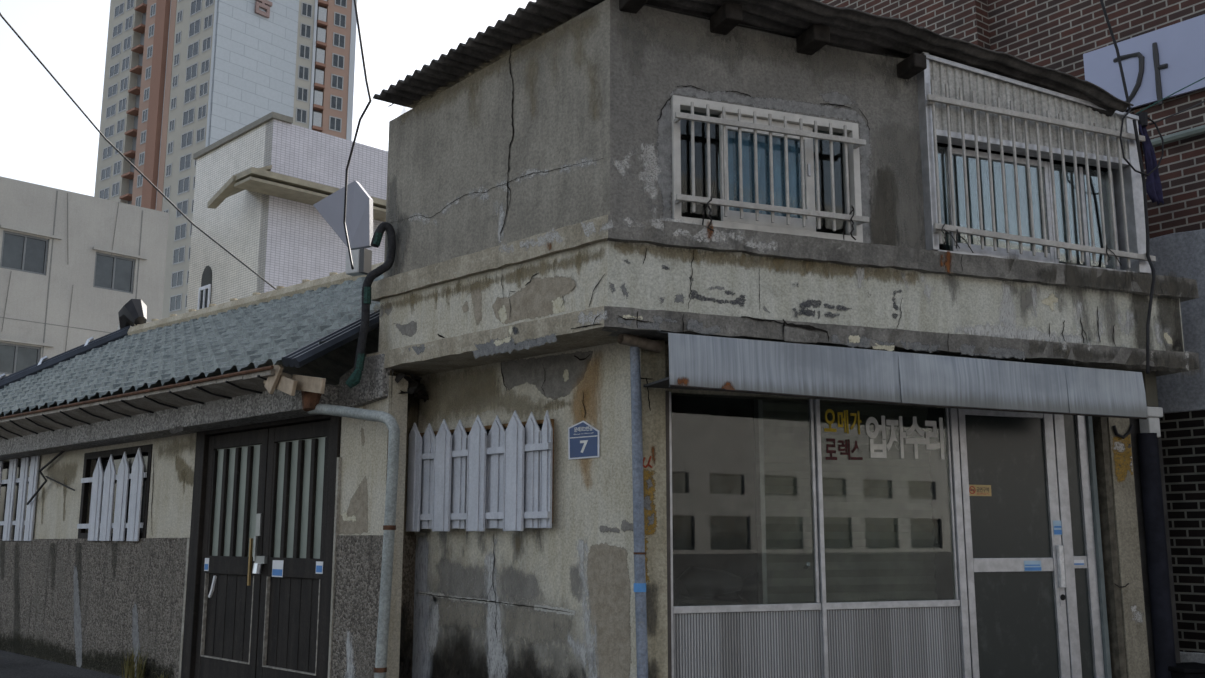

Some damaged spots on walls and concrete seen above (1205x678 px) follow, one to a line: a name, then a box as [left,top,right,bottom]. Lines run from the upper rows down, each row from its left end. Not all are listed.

crack [390,44,603,239]
peeling [462,273,593,400]
peeling [616,277,746,334]
peeling [793,299,852,319]
peeling [831,334,941,353]
water stain [399,531,597,678]
water stain [646,585,657,635]
water stain [648,662,657,678]